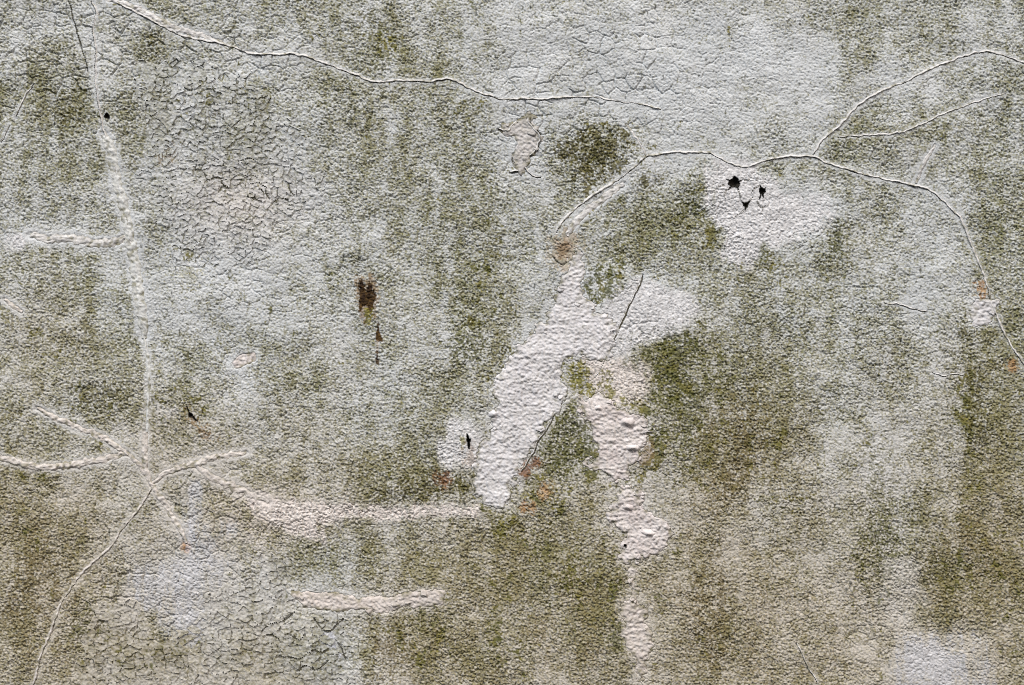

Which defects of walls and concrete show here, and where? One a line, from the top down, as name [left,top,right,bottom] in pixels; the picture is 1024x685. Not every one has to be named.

peeling [501,111,544,176]
crack [555,50,1024,364]
water stain [0,517,91,669]
crack [0,0,661,685]
rust [352,271,384,365]
peeling [430,248,701,682]
water stain [656,364,800,685]
water stain [837,437,919,623]
water stain [946,307,1005,487]